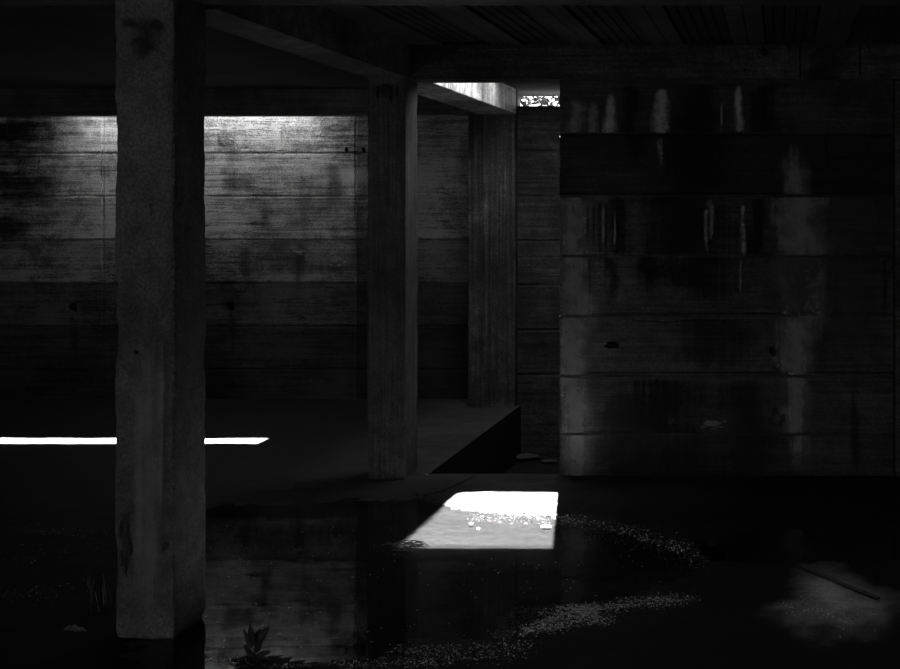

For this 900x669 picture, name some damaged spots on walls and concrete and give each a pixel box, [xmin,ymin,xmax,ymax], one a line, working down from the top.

leakage [570,95,615,133]
leakage [654,90,668,160]
leakage [560,197,764,476]